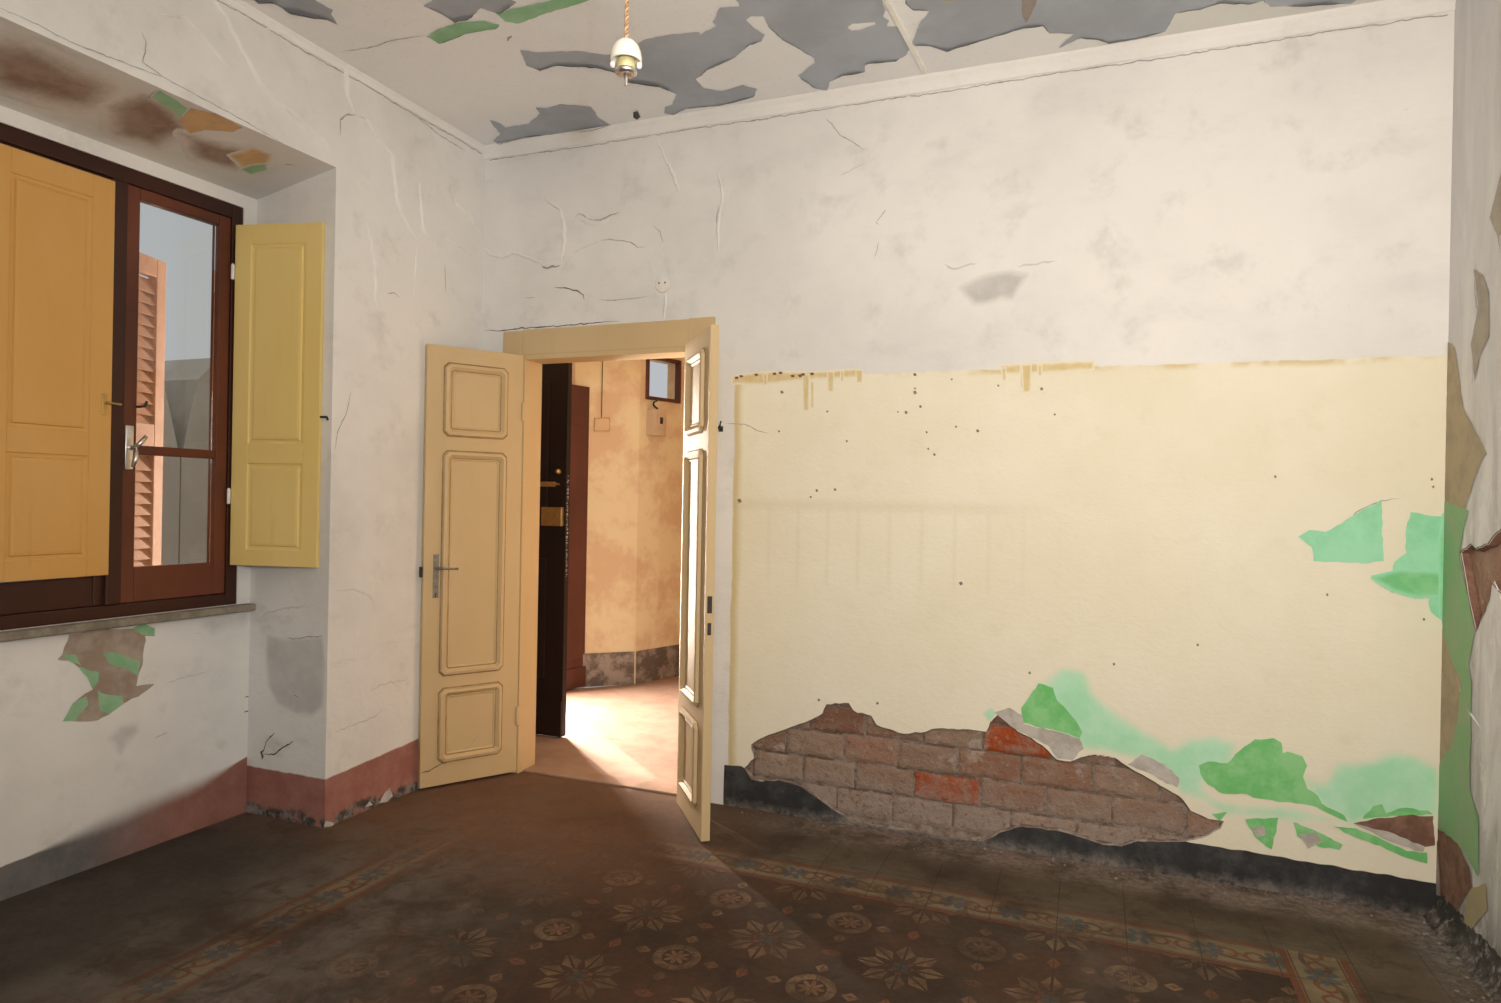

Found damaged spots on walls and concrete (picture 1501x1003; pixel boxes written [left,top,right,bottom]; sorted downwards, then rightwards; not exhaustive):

damp [0,28,249,173]
crack [1,8,285,145]
peeling [424,0,589,44]
peeling [490,104,610,144]
crack [217,0,1448,176]
peeling [520,0,1356,115]
peeling [1489,175,1501,246]
peeling [944,261,1055,306]
peeling [1199,264,1501,929]
peeling [58,624,155,722]
damp [192,604,327,718]
flaking render [745,683,1227,846]